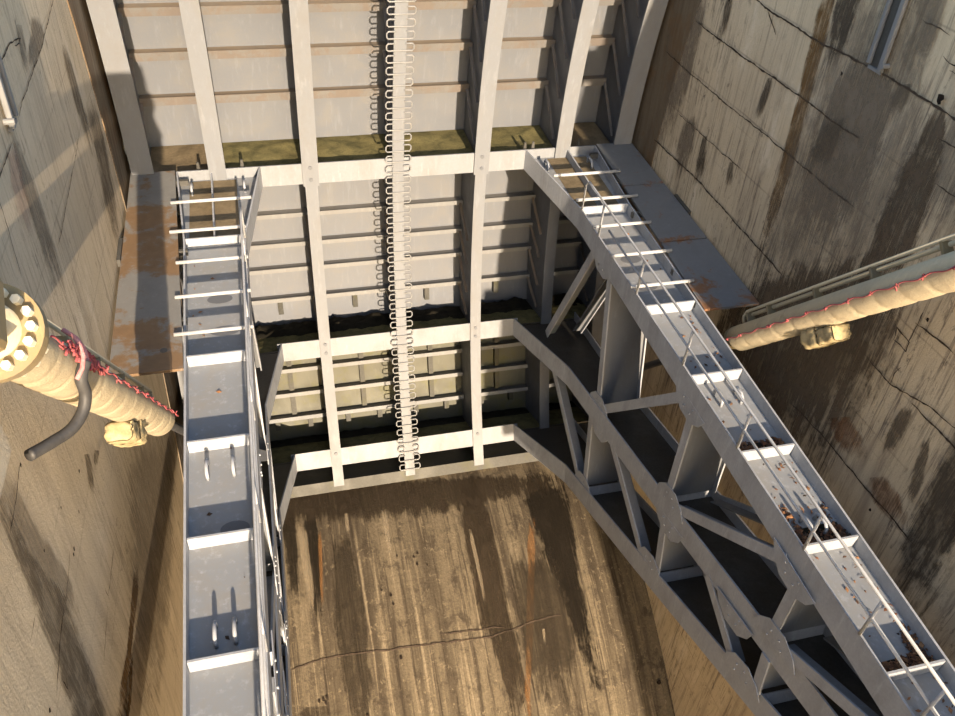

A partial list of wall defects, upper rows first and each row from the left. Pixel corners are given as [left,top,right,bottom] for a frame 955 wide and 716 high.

crack [655,140,782,275]
crack [667,52,852,206]
crack [696,21,859,138]
corrosion [765,0,834,236]
damp [717,0,946,337]
crack [757,0,955,148]
damp [731,307,901,471]
crack [868,313,955,449]
damp [0,499,103,716]
corrosion [119,570,138,716]
damp [283,470,601,716]
damp [898,433,955,613]